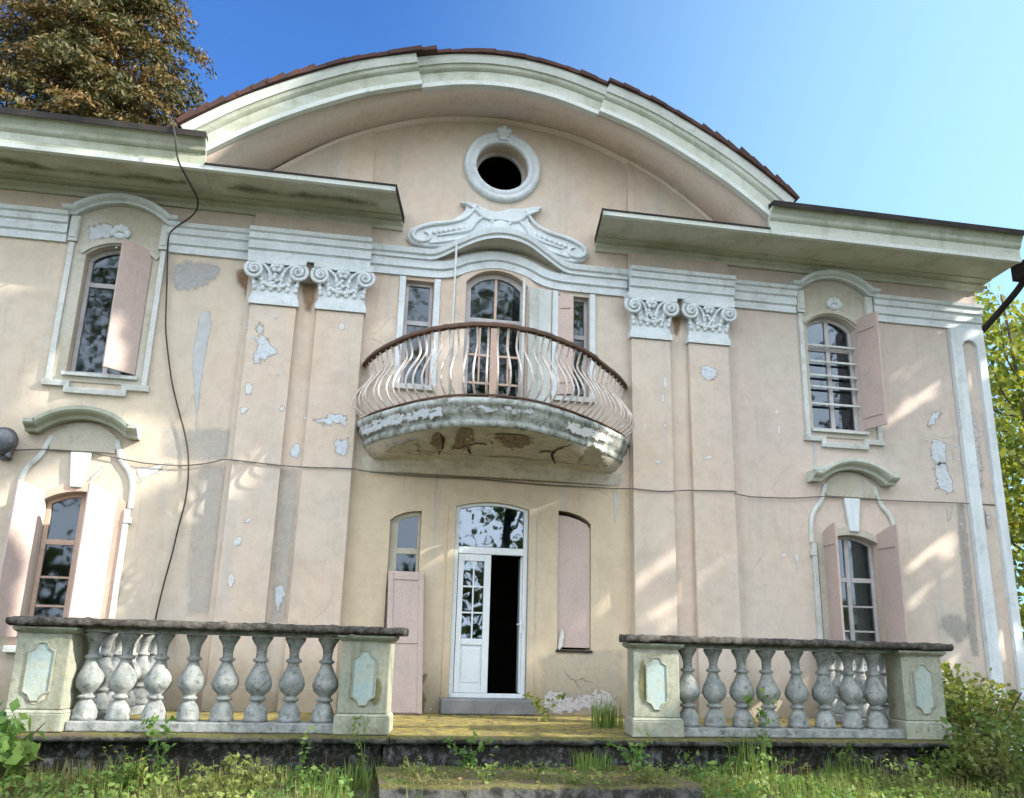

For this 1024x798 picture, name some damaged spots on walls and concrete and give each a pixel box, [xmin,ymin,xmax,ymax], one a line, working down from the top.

peeling [245,313,283,376]
peeling [304,413,349,456]
peeling [360,406,443,436]
spalling [427,429,534,456]
crack [511,443,574,464]
peeling [565,421,608,443]
peeling [925,409,963,494]
peeling [537,684,628,715]